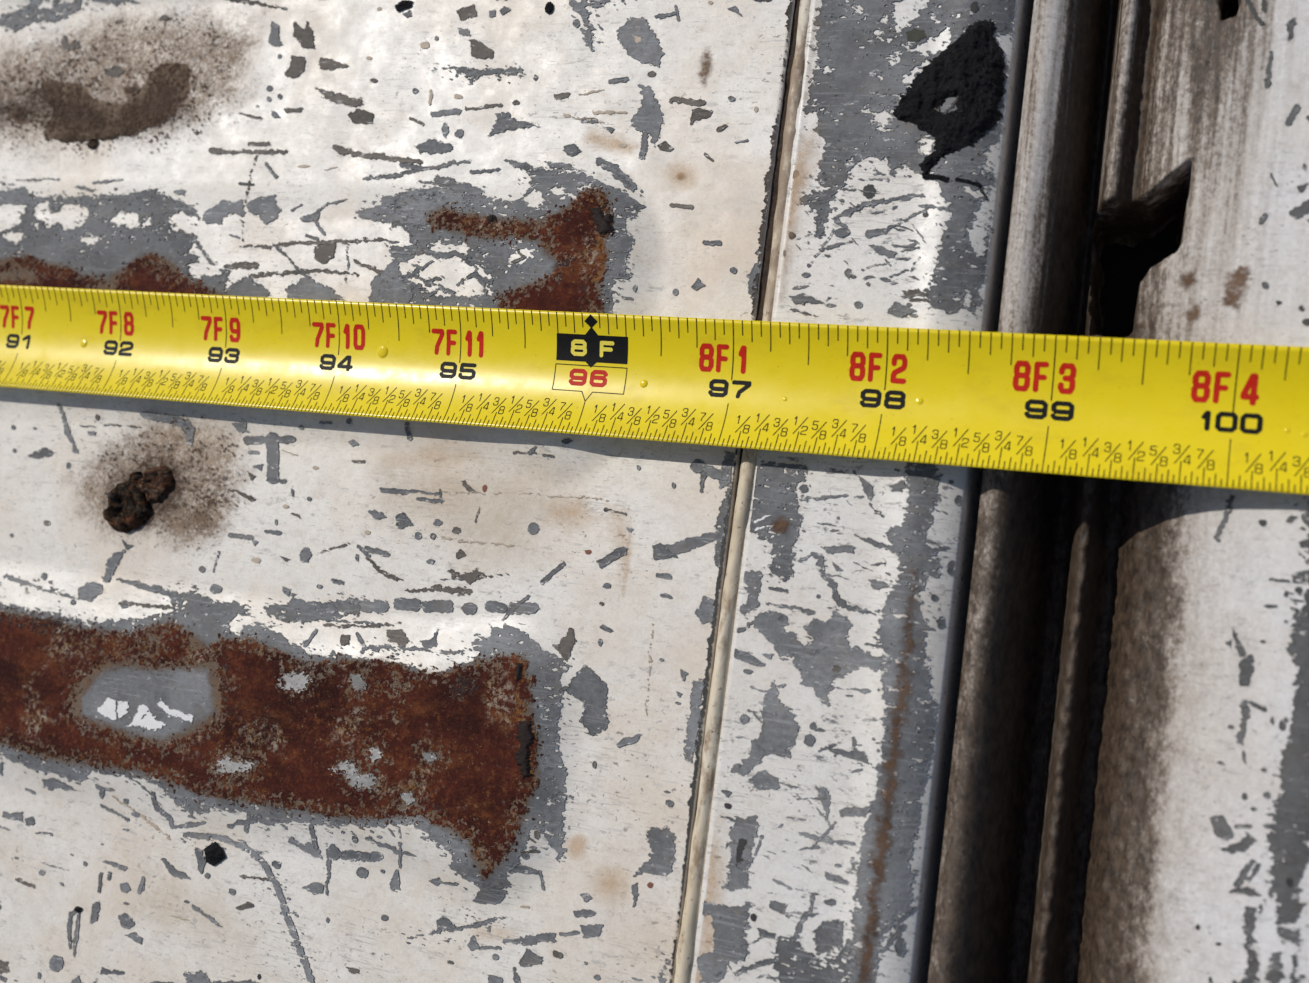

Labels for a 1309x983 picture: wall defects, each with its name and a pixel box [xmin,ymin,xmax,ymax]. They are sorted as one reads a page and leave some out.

corrosion [0,249,222,295]
peeling [0,4,581,304]
corrosion [377,165,644,314]
peeling [554,5,727,159]
peeling [783,0,1016,317]
corrosion [128,471,143,484]
peeling [0,539,177,610]
peeling [260,480,633,661]
corrosion [0,582,574,893]
peeling [555,628,609,736]
peeling [695,461,963,983]
peeling [1209,495,1309,983]